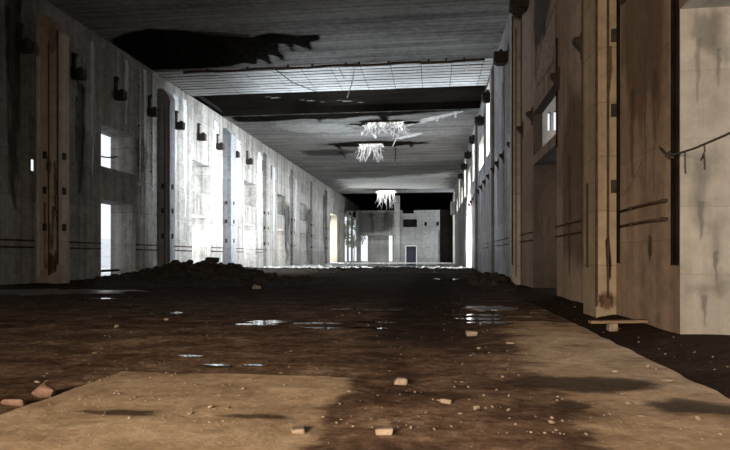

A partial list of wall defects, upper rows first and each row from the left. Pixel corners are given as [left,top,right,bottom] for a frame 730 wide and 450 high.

water stain [112,29,319,154]
spalling [329,119,427,162]
spalling [364,189,412,209]